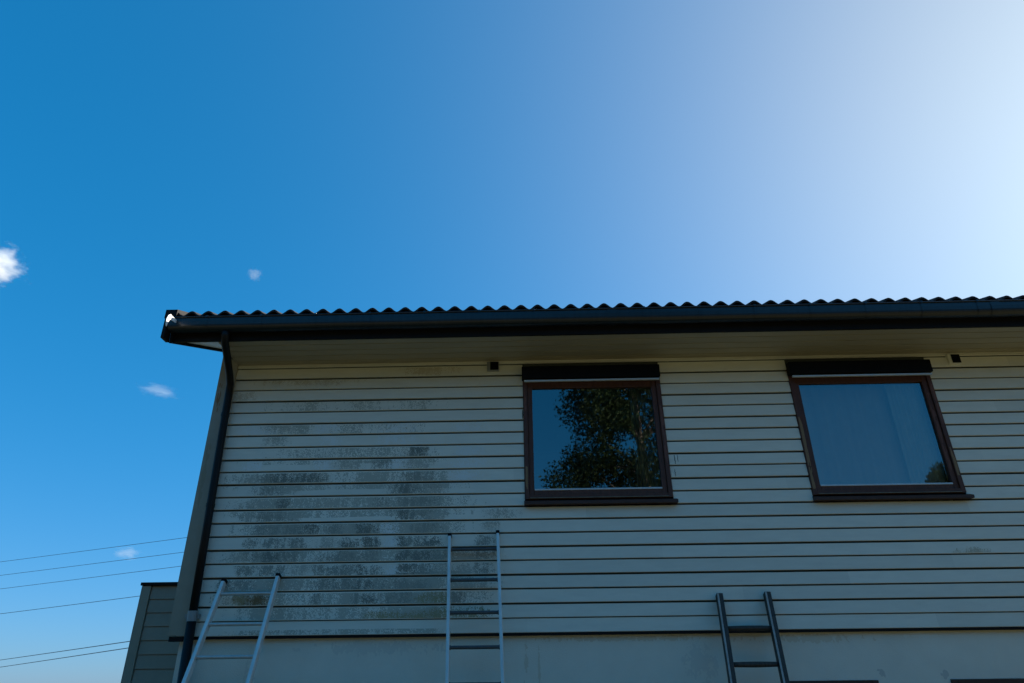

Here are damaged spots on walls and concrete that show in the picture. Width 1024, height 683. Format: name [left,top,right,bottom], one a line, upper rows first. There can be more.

damp [215,422,522,619]